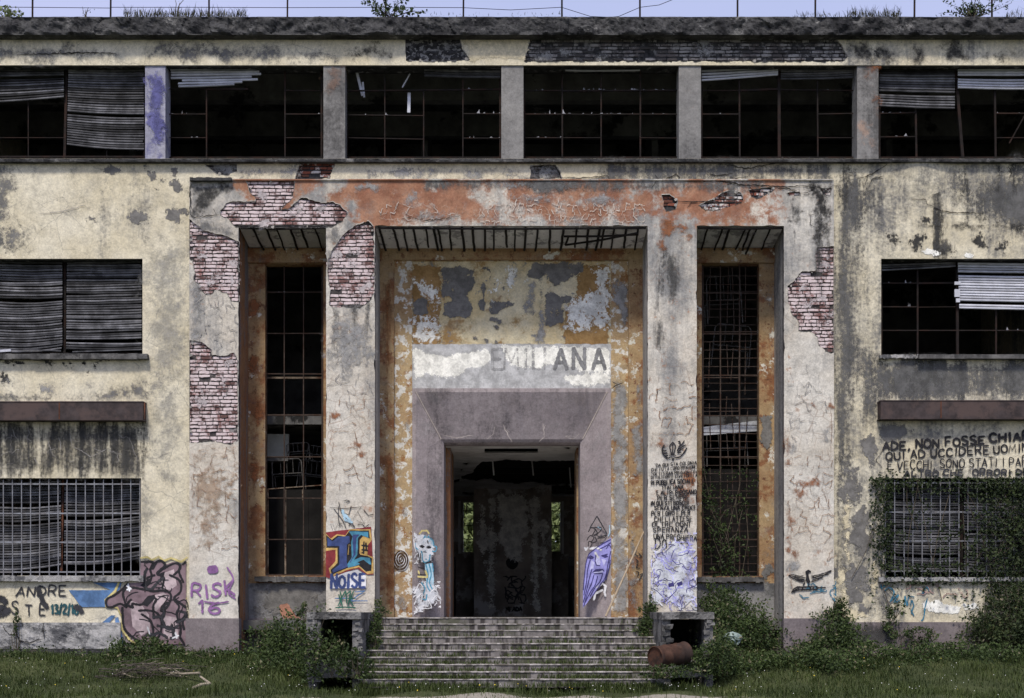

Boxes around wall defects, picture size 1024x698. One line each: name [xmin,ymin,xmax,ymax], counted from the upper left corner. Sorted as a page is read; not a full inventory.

damp [0,166,24,249]
flaking render [125,209,152,225]
flaking render [143,164,183,193]
corrosion [658,219,783,254]
flaking render [699,187,775,211]
flaking render [165,164,376,445]
flaking render [787,246,835,354]
damp [368,164,1024,568]
damp [0,422,148,480]
flaking render [412,261,643,612]
corrosion [385,459,395,589]